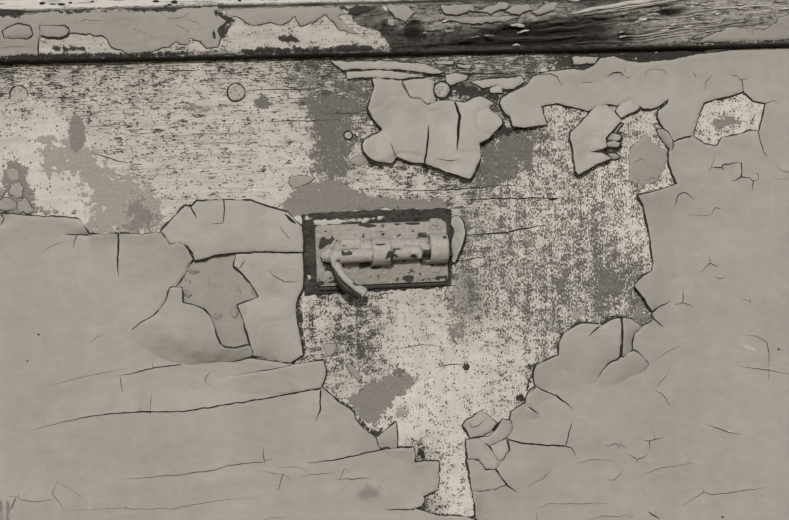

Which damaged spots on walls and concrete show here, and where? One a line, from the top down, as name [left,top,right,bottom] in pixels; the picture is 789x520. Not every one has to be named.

peeling [2,23,70,40]
crack [424,52,591,84]
peeling [694,93,764,145]
crack [709,132,786,188]
crack [387,185,563,200]
crack [467,225,546,236]
crack [114,233,122,277]
peeling [0,50,693,520]
crack [37,390,321,429]
crack [508,388,690,480]
crack [133,446,411,489]
crack [494,469,516,492]